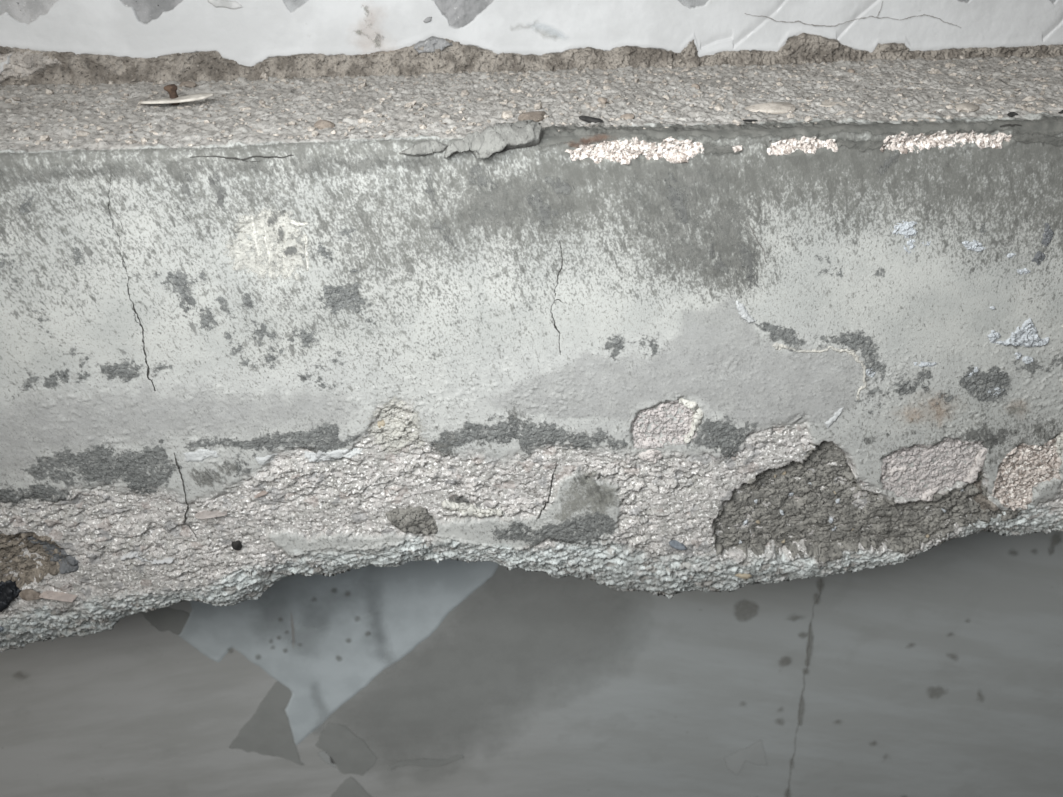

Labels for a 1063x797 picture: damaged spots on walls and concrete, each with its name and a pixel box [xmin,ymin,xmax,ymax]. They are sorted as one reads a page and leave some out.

spalling [0,50,61,84]
peeling [121,0,183,24]
peeling [423,0,494,28]
spalling [783,33,839,52]
damp [538,114,1063,288]
crack [108,170,155,391]
crack [550,242,563,352]
peeling [304,397,426,462]
spalling [631,398,704,464]
spalling [713,406,1063,563]
spalling [385,506,438,535]
spalling [0,532,79,589]